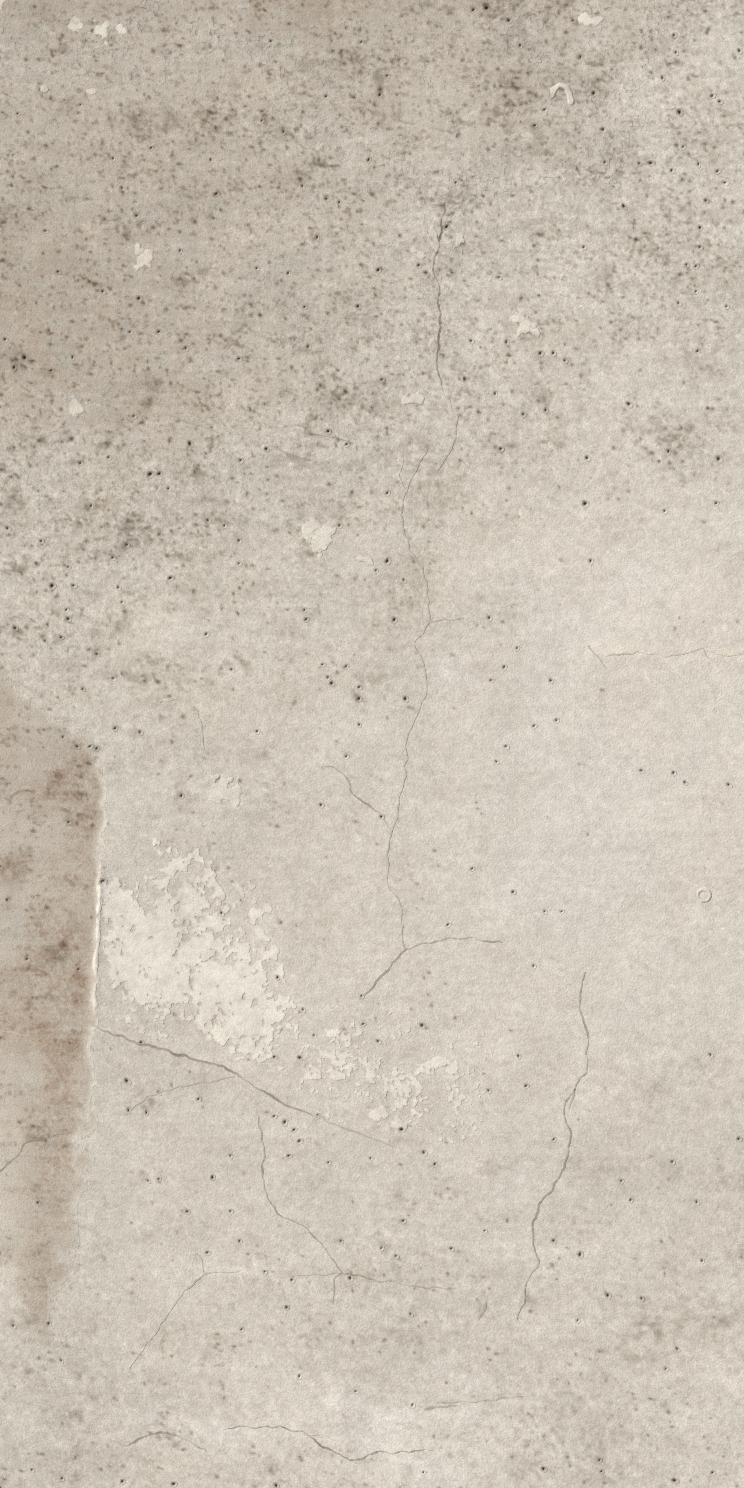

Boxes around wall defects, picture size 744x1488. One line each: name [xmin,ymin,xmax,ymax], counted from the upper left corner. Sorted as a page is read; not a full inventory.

crack [322,202,502,999]
damp [0,677,108,1343]
peeling [92,838,485,1144]
crack [92,972,589,1321]
crack [129,1253,240,1369]
crack [109,1425,431,1461]
crack [424,1396,519,1410]